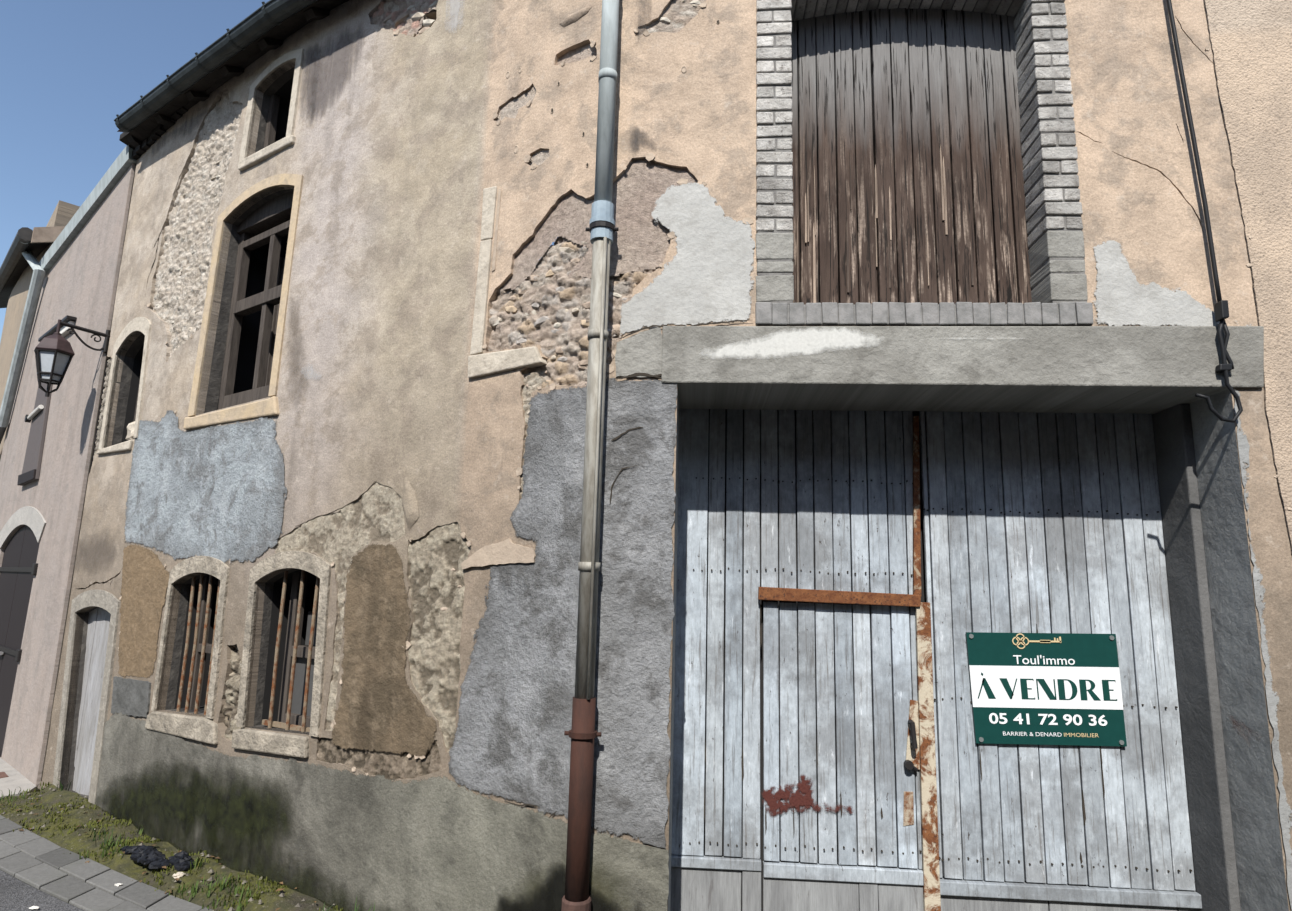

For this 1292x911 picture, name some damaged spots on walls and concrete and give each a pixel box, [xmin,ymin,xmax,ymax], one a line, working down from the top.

spalling [372,0,438,36]
spalling [493,68,536,126]
spalling [557,41,597,86]
spalling [634,0,707,36]
spalling [147,85,243,359]
spalling [606,153,707,377]
spalling [482,191,594,499]
flaking render [274,482,471,780]
damp [102,766,364,911]